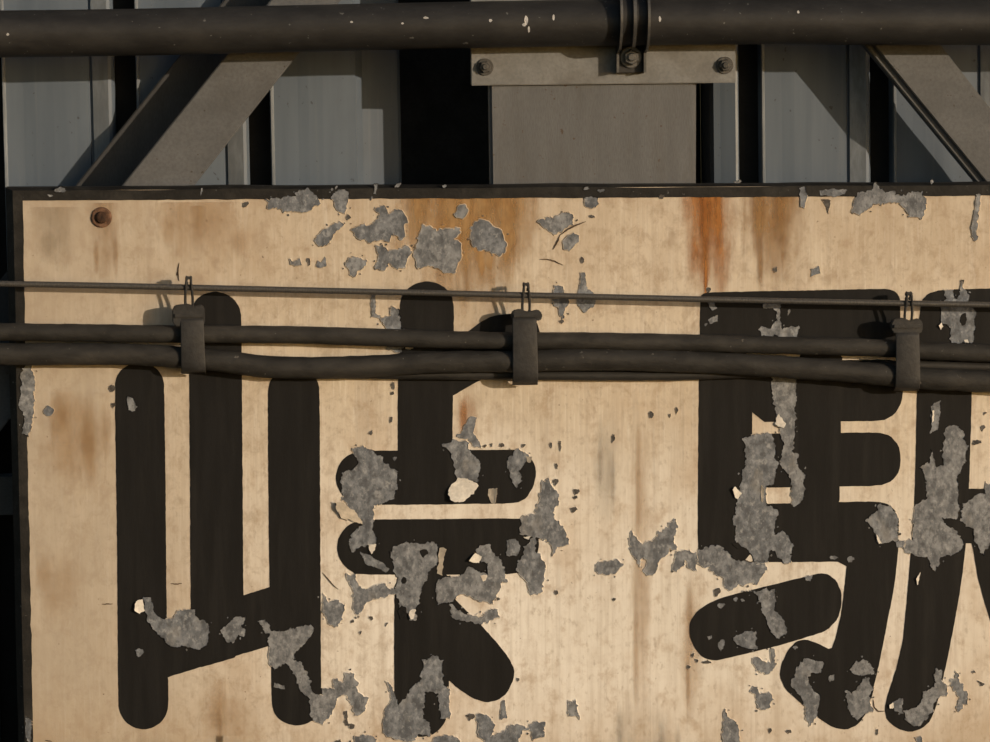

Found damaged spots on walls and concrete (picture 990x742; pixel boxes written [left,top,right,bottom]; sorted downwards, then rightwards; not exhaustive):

peeling [264,183,509,278]
rust [688,197,724,293]
peeling [370,295,402,329]
peeling [18,365,55,437]
peeling [441,416,532,504]
peeling [865,400,990,571]
peeling [134,430,581,742]
peeling [594,377,806,712]
peeling [790,645,835,727]
peeling [843,655,879,721]
peeling [889,667,971,742]